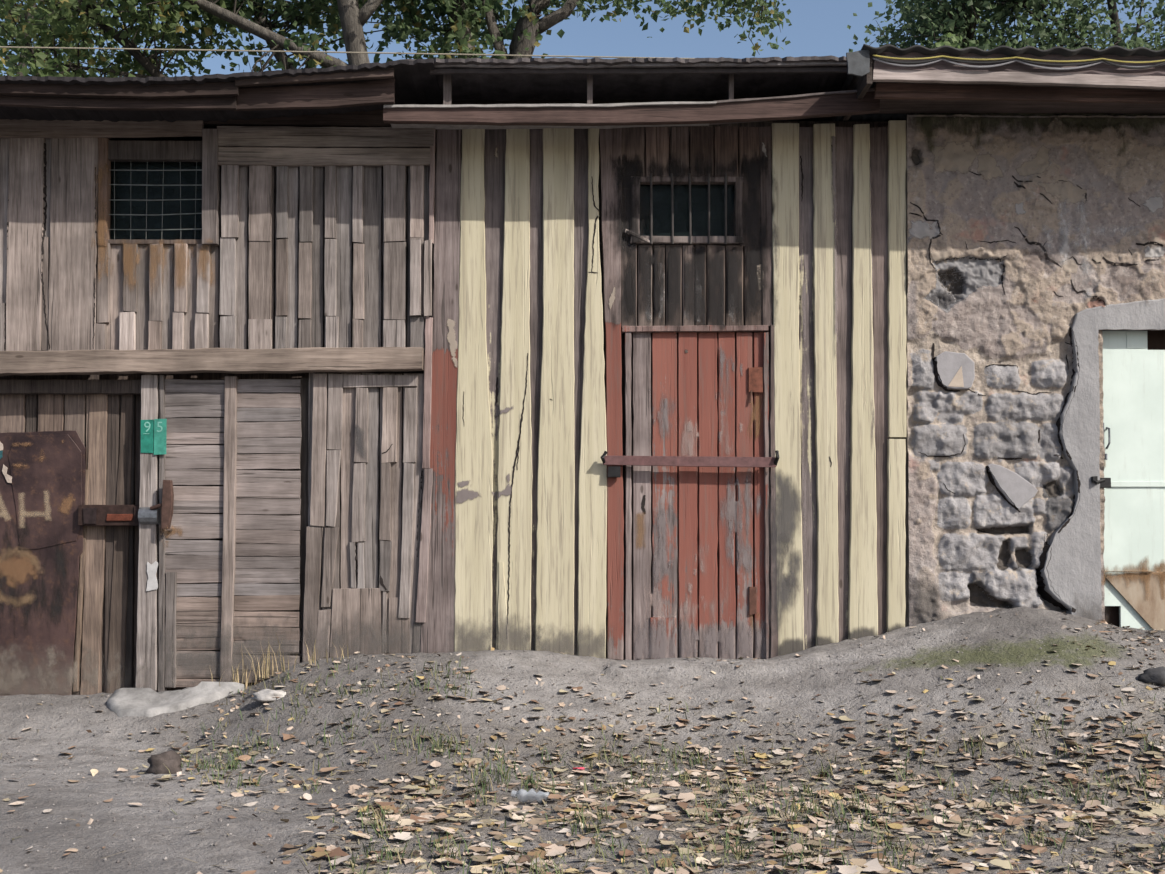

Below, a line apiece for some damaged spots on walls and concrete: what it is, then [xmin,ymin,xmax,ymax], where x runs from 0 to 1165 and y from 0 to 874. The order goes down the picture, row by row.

crack [40,143,50,349]
crack [909,202,1163,307]
spalling [923,251,1005,313]
flaking render [931,343,975,392]
rust [60,496,73,513]
crack [495,353,552,624]
flaking render [985,464,1062,512]
crack [968,327,1081,613]
rust [0,551,38,586]
spalling [968,584,1013,609]
spalling [978,526,1032,571]
rust [1103,560,1165,598]